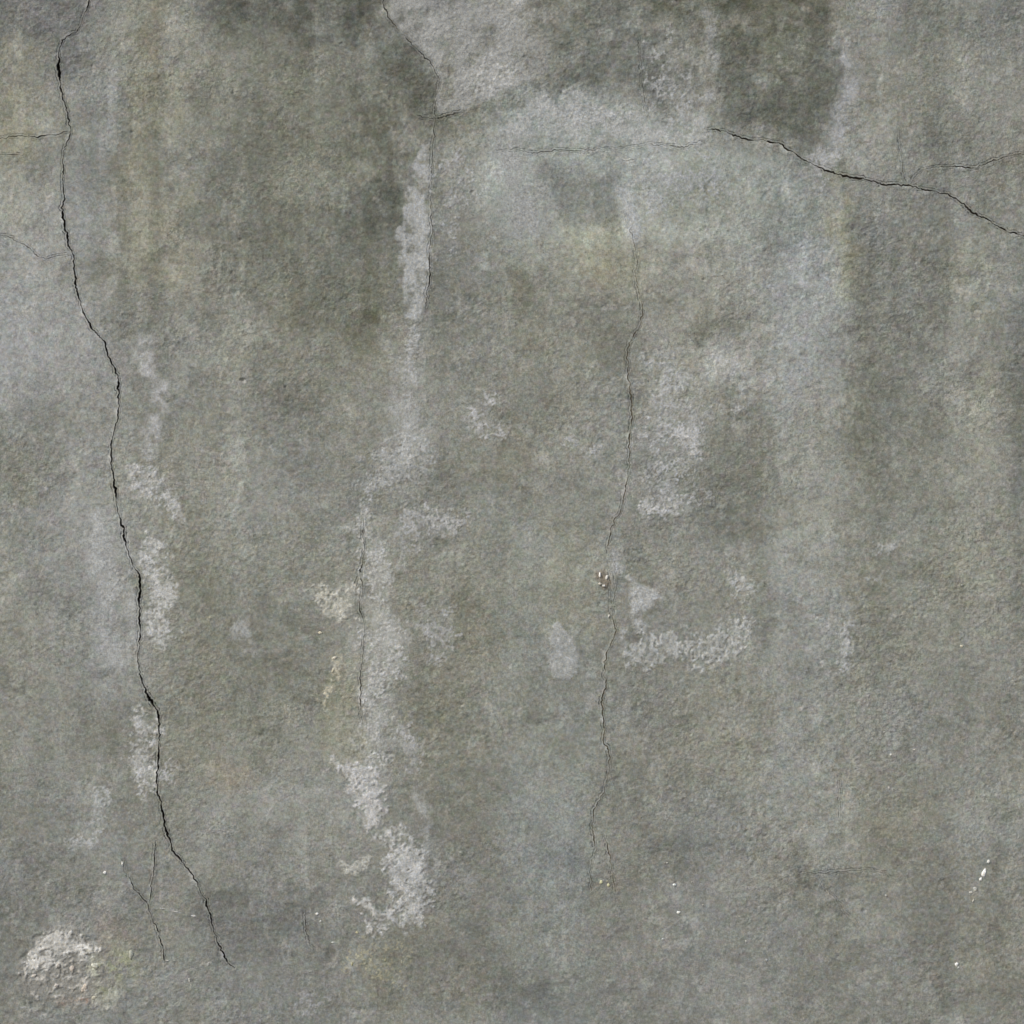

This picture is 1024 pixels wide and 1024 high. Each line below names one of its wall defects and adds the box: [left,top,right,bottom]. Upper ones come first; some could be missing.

damp [199,0,435,256]
crack [380,0,465,308]
damp [530,0,846,161]
crack [496,126,1024,239]
crack [0,0,237,971]
crack [353,516,367,725]
efflorescence [295,297,481,993]
crack [588,208,645,895]